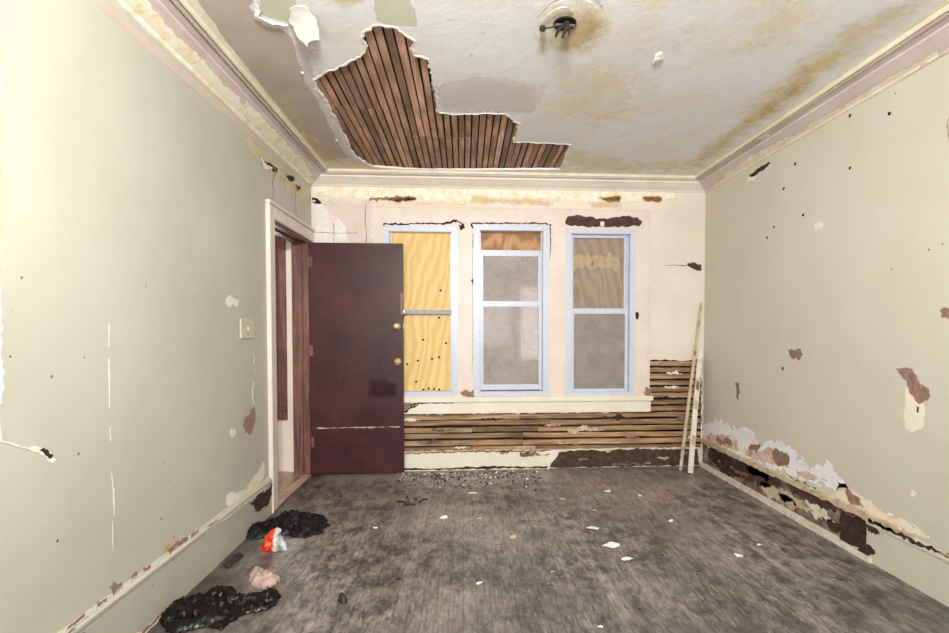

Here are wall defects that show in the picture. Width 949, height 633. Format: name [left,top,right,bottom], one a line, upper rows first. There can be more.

peeling [114,0,677,243]
peeling [230,353,256,437]
peeling [896,367,930,433]
flaking render [30,446,56,463]
peeling [225,461,273,512]
spalling [404,450,550,470]
peeling [680,419,930,556]
spalling [137,604,171,633]